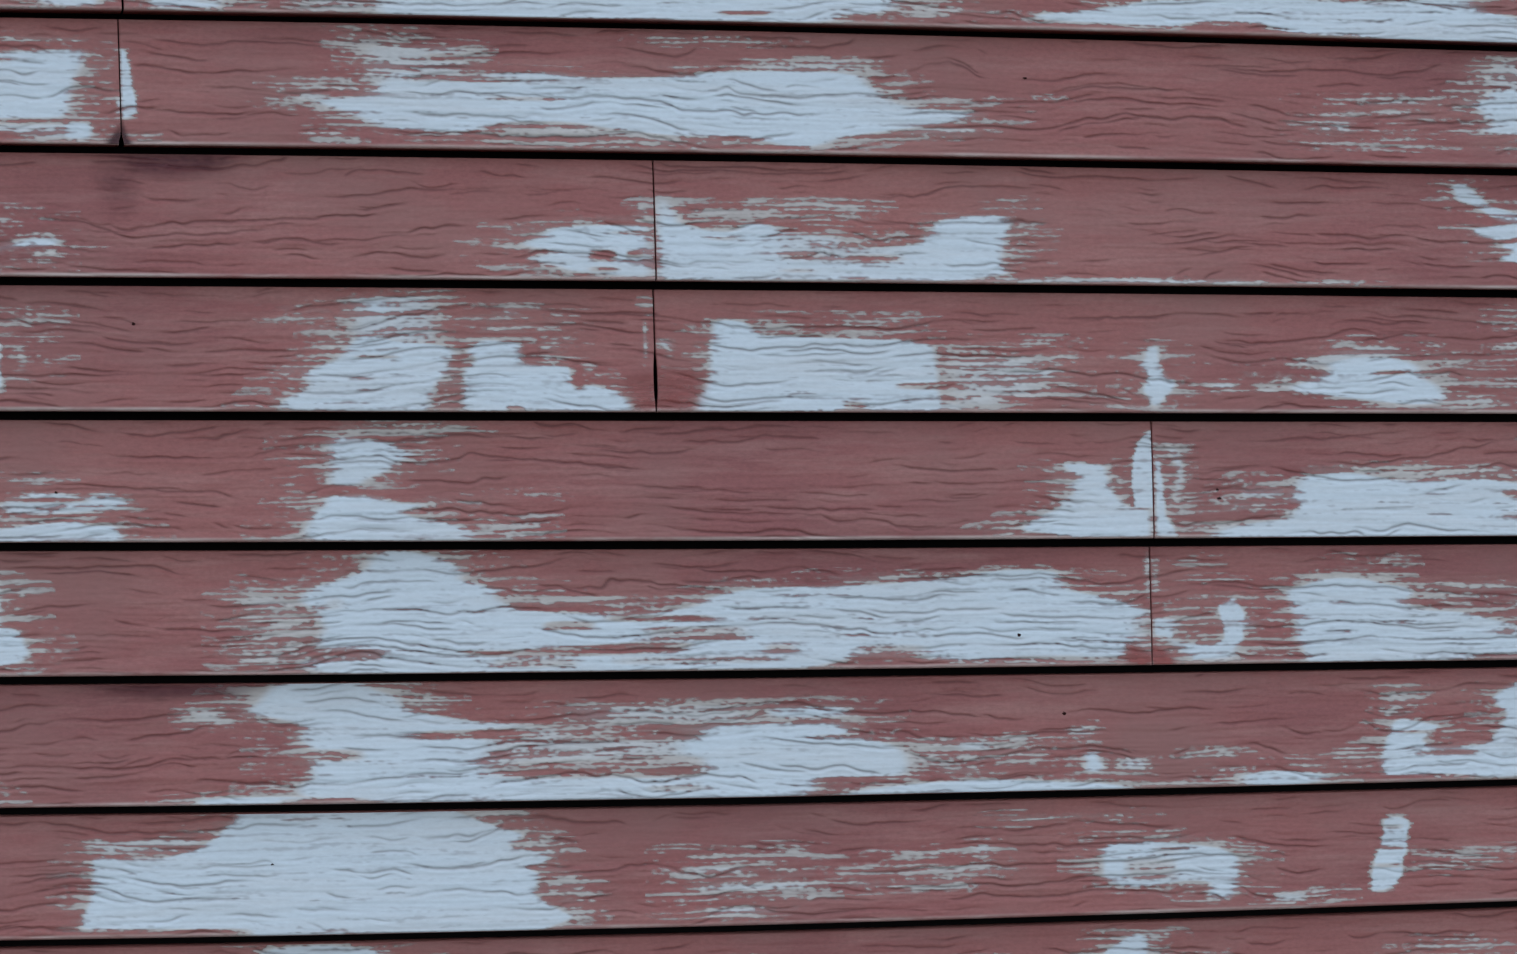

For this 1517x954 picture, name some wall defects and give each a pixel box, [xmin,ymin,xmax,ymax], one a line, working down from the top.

peeling [20,0,112,8]
peeling [0,36,161,142]
peeling [146,0,1030,153]
peeling [1022,0,1517,153]
peeling [456,196,1265,286]
peeling [1436,180,1517,263]
peeling [0,308,79,393]
peeling [0,472,149,542]
peeling [0,571,75,675]
peeling [57,290,1517,954]